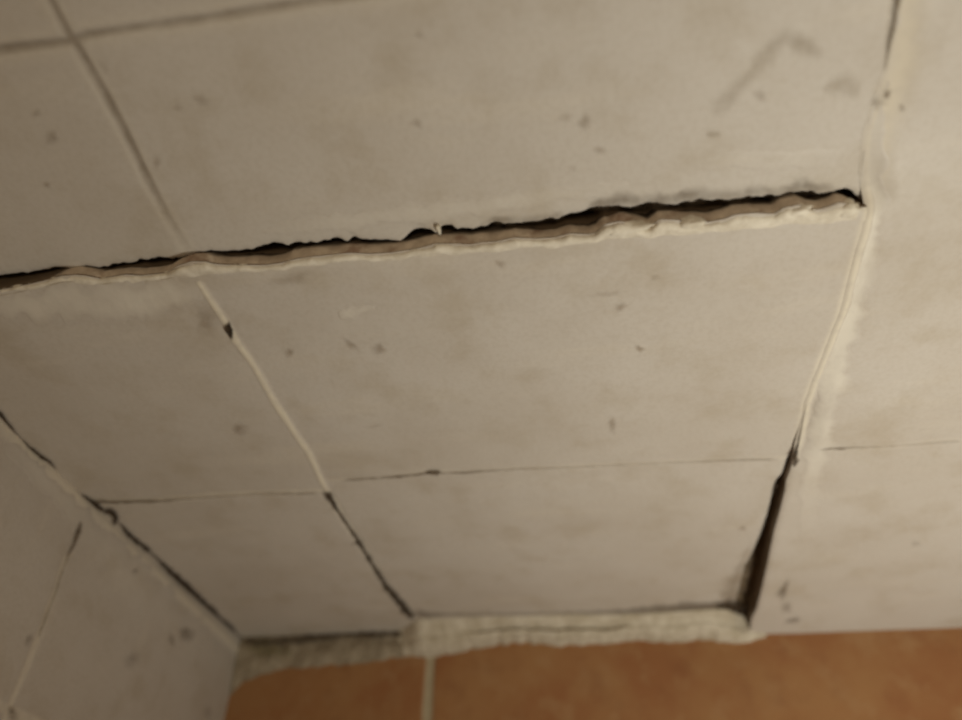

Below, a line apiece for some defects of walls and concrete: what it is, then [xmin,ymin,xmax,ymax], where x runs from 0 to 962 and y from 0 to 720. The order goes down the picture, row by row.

crack [1,191,862,293]
crack [0,412,54,467]
crack [792,437,800,467]
crack [69,493,414,644]
crack [687,485,778,617]